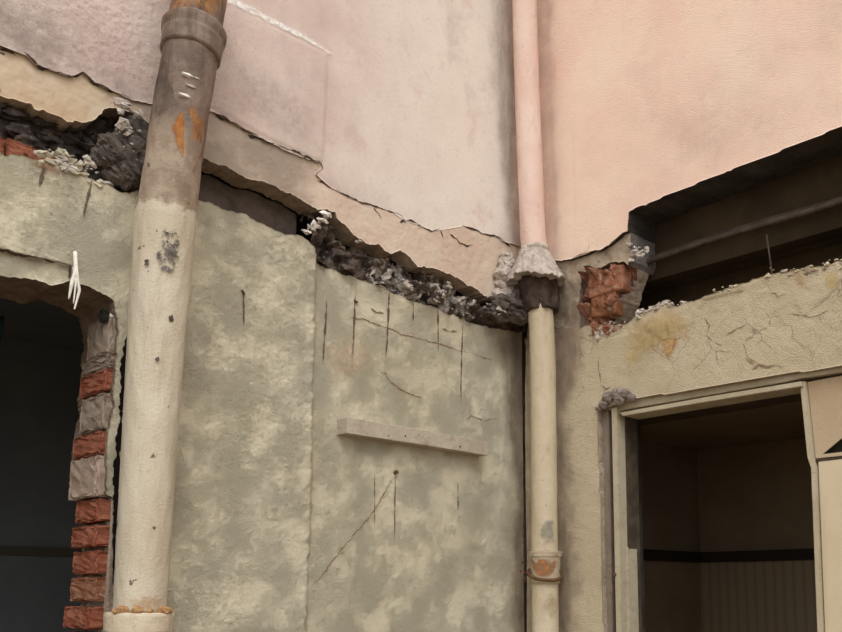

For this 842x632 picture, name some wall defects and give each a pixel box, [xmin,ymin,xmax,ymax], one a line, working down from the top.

peeling [178,72,200,98]
flaking render [0,97,149,193]
rust [173,110,205,155]
peeling [144,230,179,272]
spalling [198,174,528,333]
spalling [576,243,687,342]
flaking render [752,258,842,286]
crack [705,319,757,363]
crack [112,337,127,586]